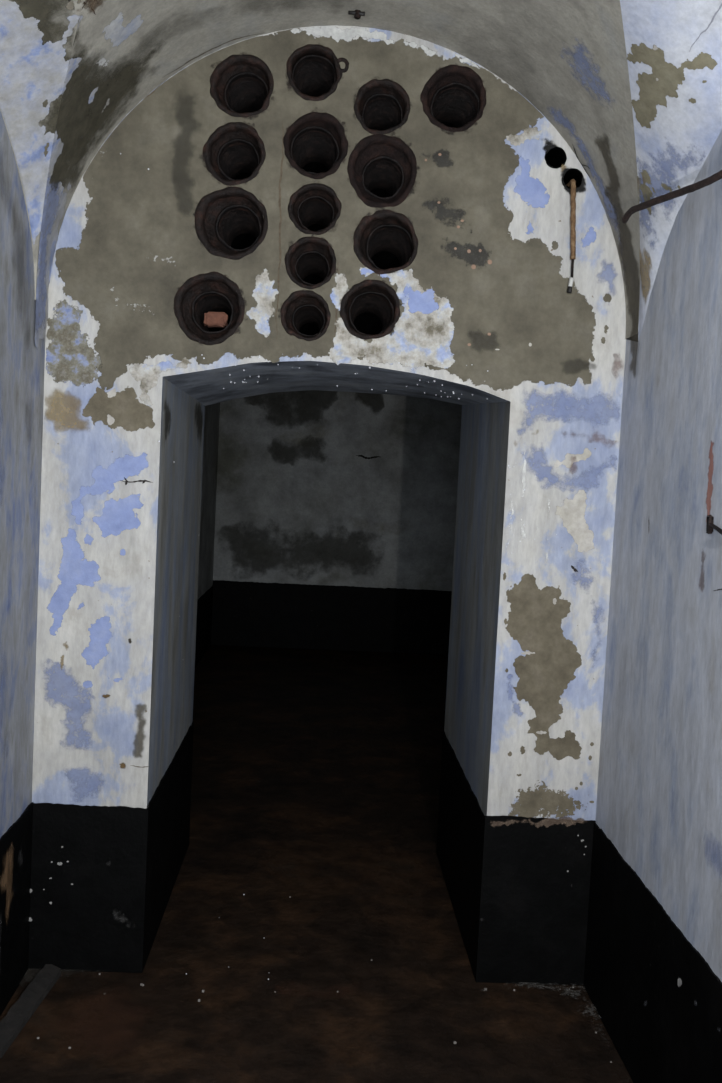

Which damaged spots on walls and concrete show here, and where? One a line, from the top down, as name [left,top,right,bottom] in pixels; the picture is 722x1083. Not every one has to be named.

crack [689,4,722,52]
water stain [10,0,155,192]
peeling [627,43,717,128]
peeling [0,0,620,435]
water stain [247,390,337,425]
water stain [357,393,384,412]
water stain [270,438,324,463]
corrosion [706,441,714,522]
peeling [47,452,149,636]
water stain [224,527,372,574]
peeling [503,572,595,760]
peeling [490,781,594,855]